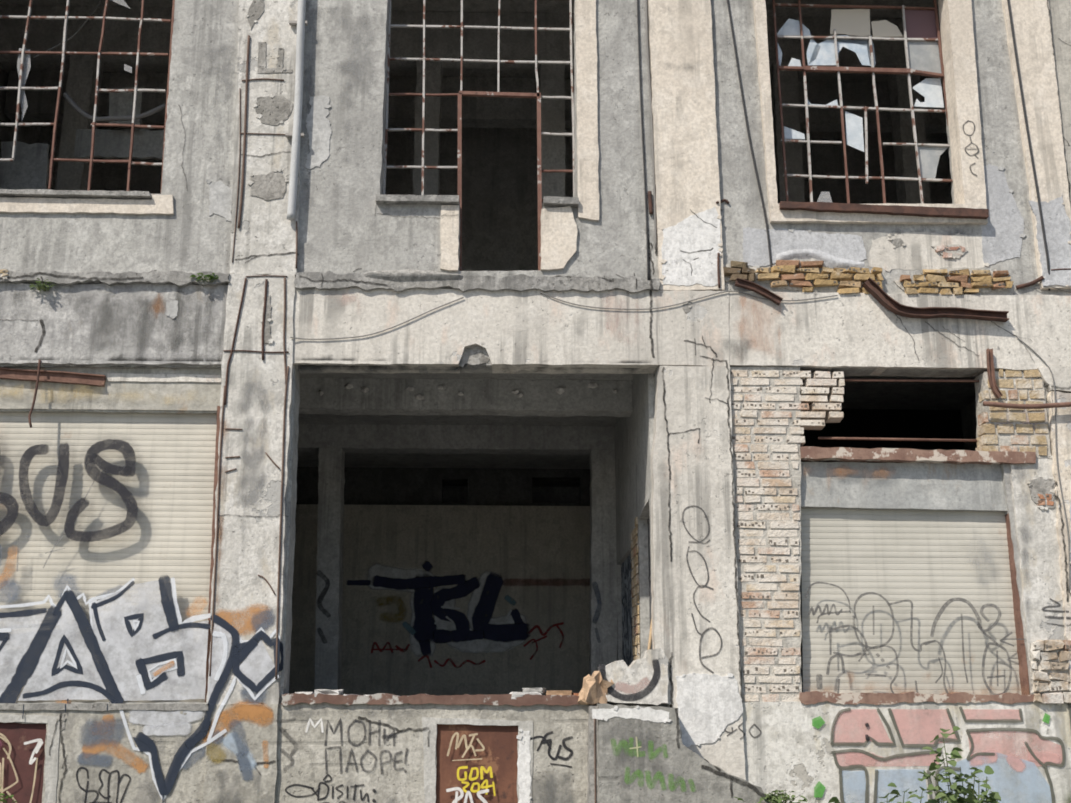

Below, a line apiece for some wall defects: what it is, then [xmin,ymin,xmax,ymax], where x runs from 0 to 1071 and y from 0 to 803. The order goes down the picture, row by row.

spalling [253,94,293,126]
peeling [305,95,332,169]
spalling [247,168,289,201]
peeling [659,164,1071,295]
rust [0,367,106,387]
crack [556,211,717,562]
rust [209,221,298,679]
crack [684,336,742,698]
spalling [1027,476,1055,510]
flaking render [1029,639,1071,706]
peeling [592,673,743,747]